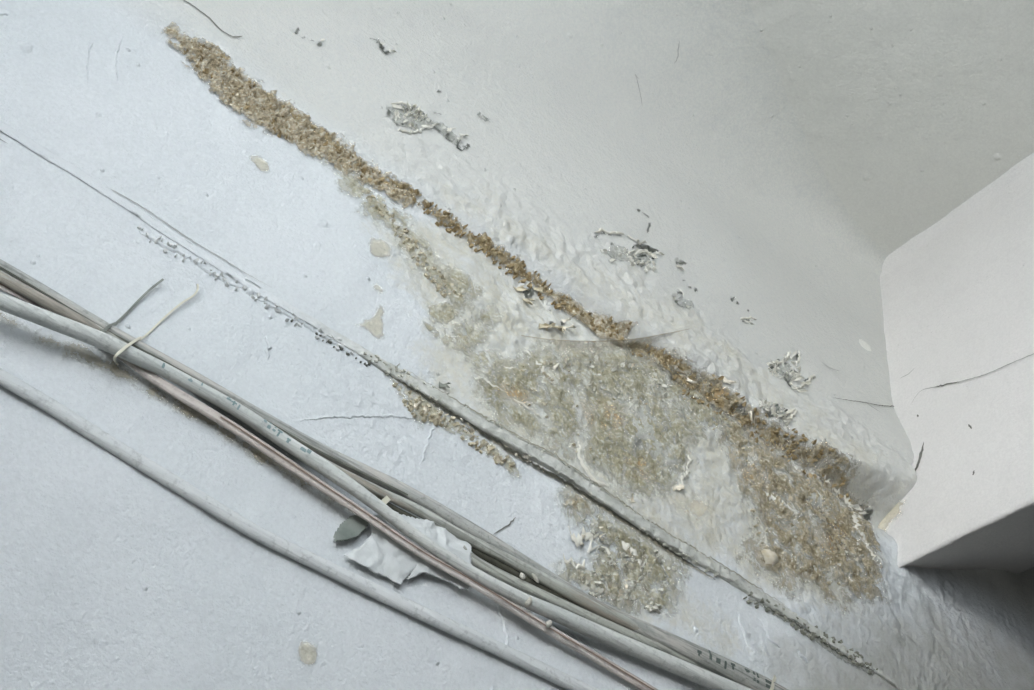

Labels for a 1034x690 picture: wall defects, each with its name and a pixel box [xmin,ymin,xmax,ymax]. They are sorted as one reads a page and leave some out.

peeling [387,101,470,151]
peeling [594,209,665,273]
peeling [514,285,544,305]
peeling [673,261,697,308]
water stain [392,381,519,474]
spalling [470,346,755,503]
peeling [759,398,797,426]
peeling [766,350,816,392]
crack [837,353,1034,412]
spalling [559,487,687,614]
water stain [719,419,899,610]
peeling [851,504,880,551]